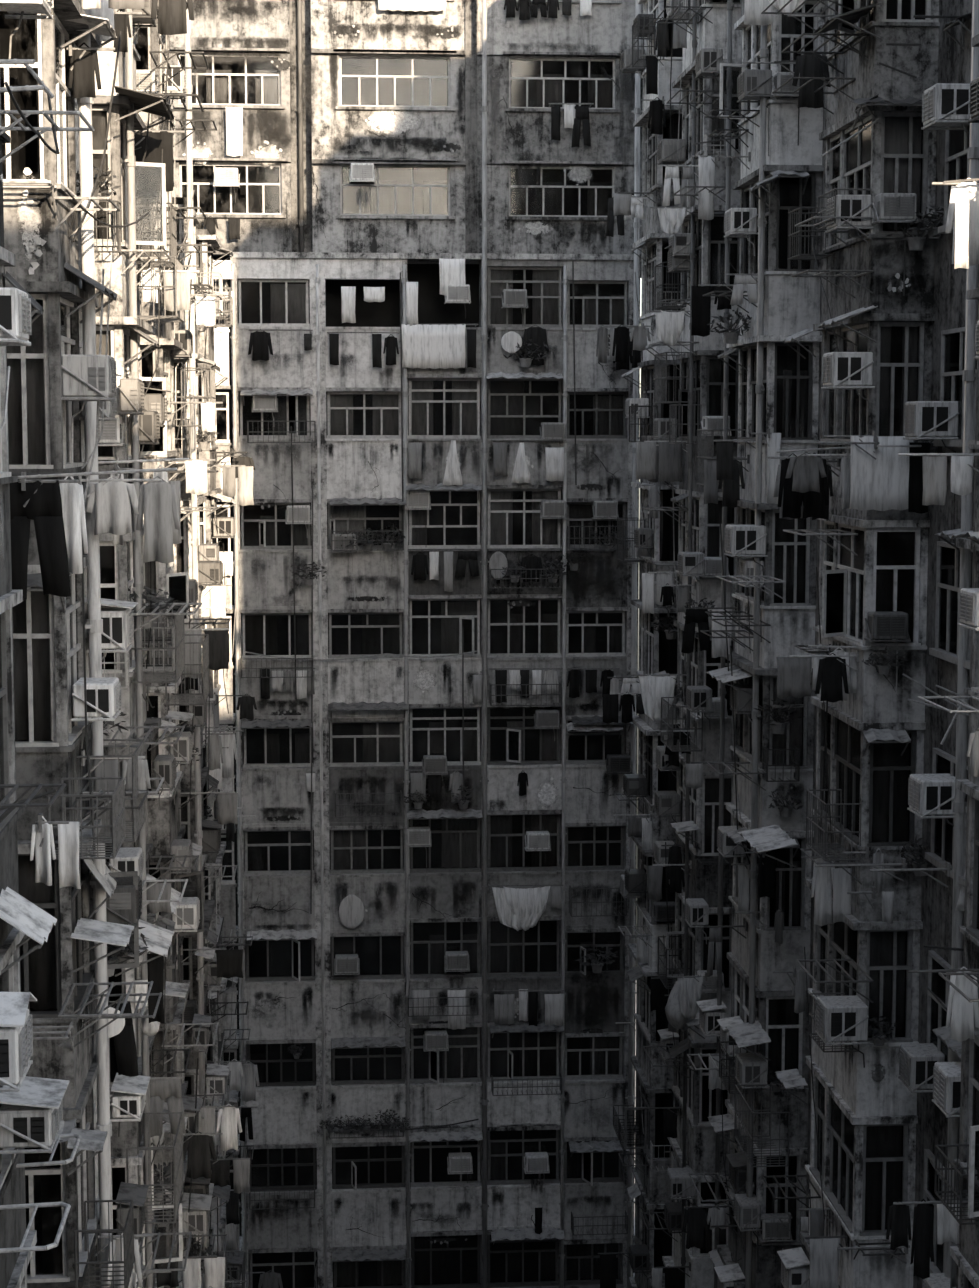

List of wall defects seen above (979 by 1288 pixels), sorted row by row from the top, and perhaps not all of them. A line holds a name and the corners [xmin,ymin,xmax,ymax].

leakage [193,0,274,17]
leakage [338,24,459,39]
leakage [197,37,288,62]
leakage [339,777,470,816]
leakage [336,884,347,902]
leakage [376,883,397,911]